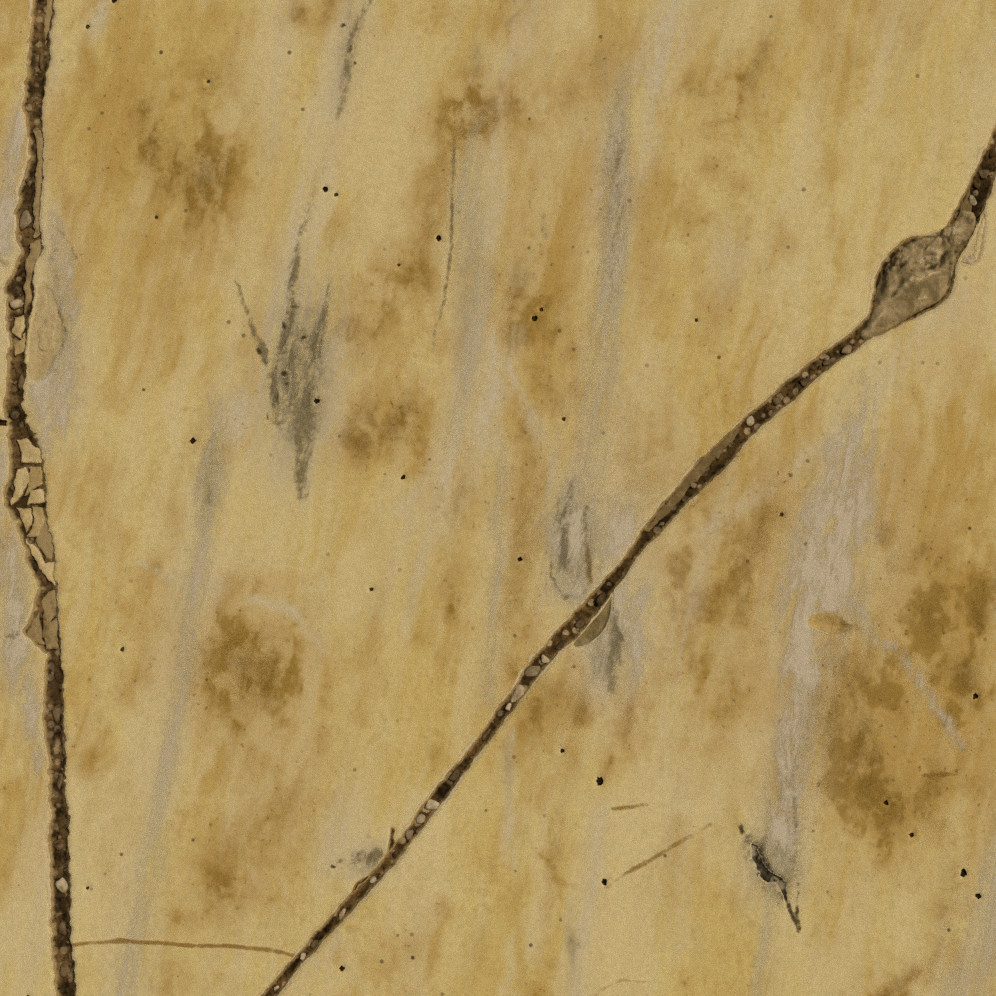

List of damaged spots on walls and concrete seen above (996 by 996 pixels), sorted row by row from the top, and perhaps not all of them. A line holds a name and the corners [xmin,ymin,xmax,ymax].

peeling [0,533,38,739]
crack [0,0,78,996]
crack [258,122,996,996]
damp [766,403,897,870]